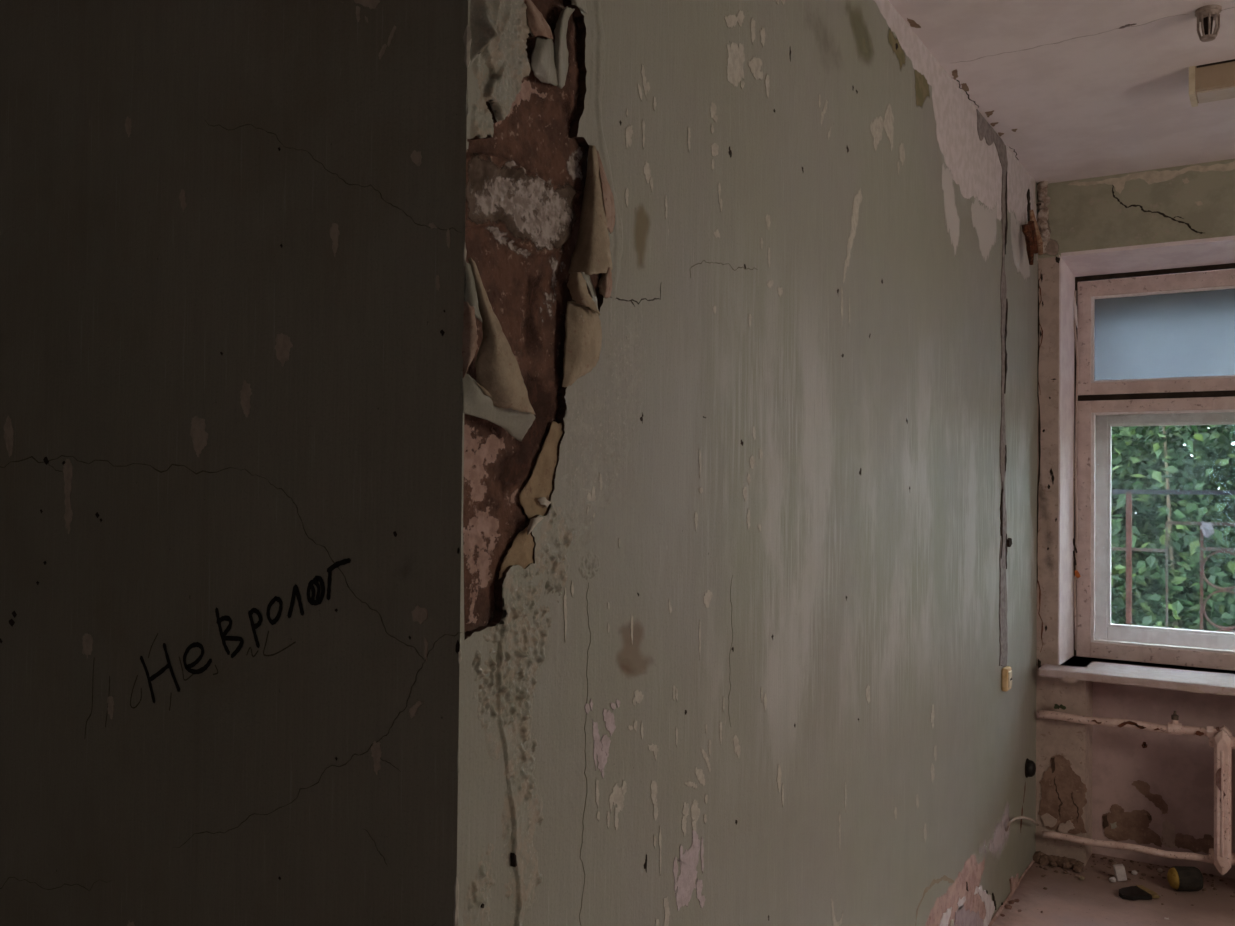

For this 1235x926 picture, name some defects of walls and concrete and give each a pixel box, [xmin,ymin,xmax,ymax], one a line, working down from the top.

peeling [724,10,770,98]
spalling [1027,181,1051,254]
crack [1112,186,1203,234]
peeling [455,0,629,663]
crack [0,455,462,848]
peeling [584,699,644,830]
spalling [1038,754,1087,835]
spalling [1102,780,1214,854]
peeling [925,804,1010,926]